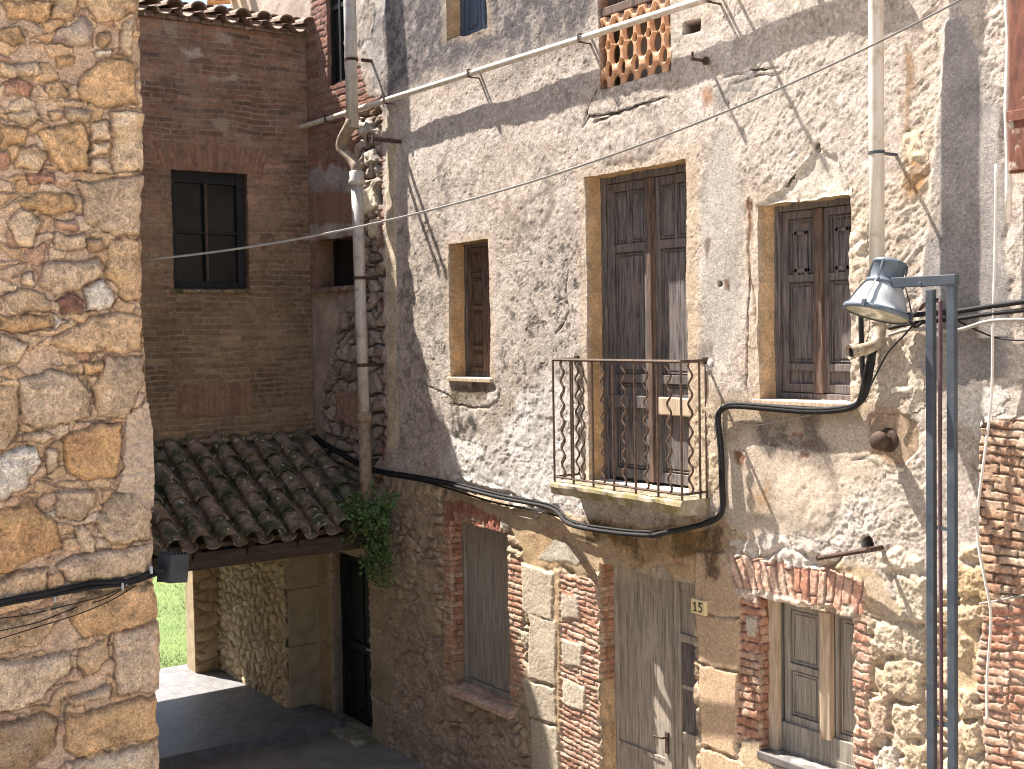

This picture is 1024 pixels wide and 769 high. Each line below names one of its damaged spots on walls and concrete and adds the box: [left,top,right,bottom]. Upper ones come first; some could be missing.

crack [583,87,664,127]
flaking render [901,127,928,164]
flaking render [848,216,869,296]
flaking render [850,313,869,403]
crack [425,384,500,408]